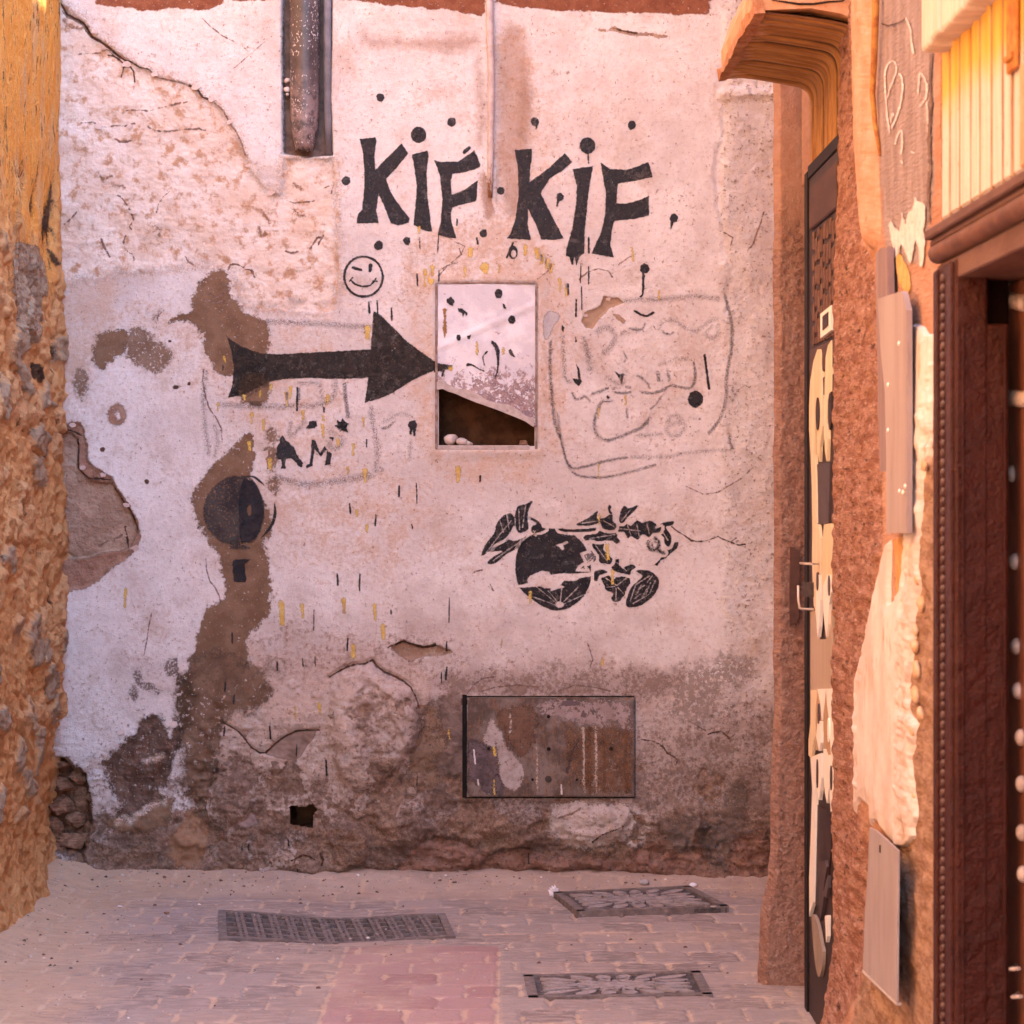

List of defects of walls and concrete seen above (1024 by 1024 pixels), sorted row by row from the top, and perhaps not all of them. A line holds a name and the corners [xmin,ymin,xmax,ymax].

crack [61,3,246,156]
spalling [11,0,341,344]
flaking render [581,296,625,329]
spalling [62,420,142,592]
damp [104,427,281,870]
crack [221,712,334,754]
crack [329,659,420,722]
spalling [387,639,453,661]
damp [405,703,448,792]
damp [671,653,756,724]
spalling [48,756,96,862]
damp [661,775,750,872]